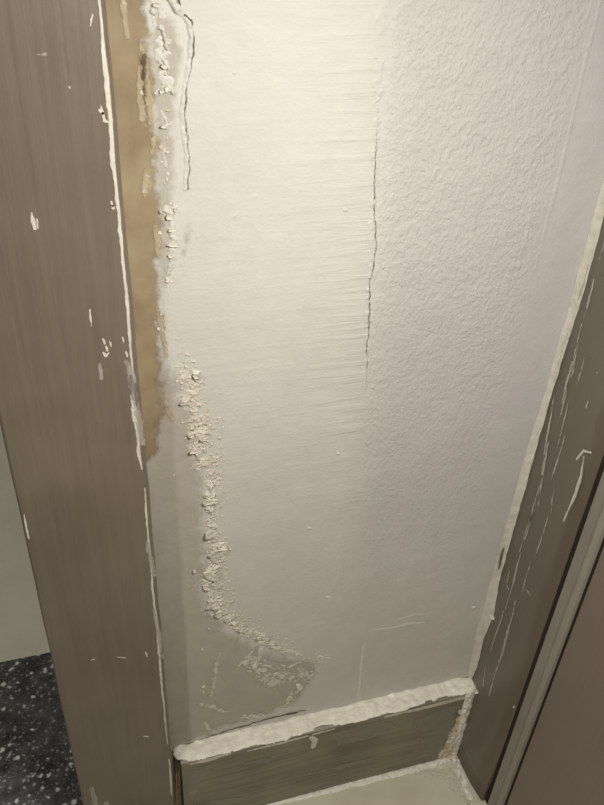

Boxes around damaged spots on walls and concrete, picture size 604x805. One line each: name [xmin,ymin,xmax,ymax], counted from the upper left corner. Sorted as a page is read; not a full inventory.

peeling [90,0,331,745]